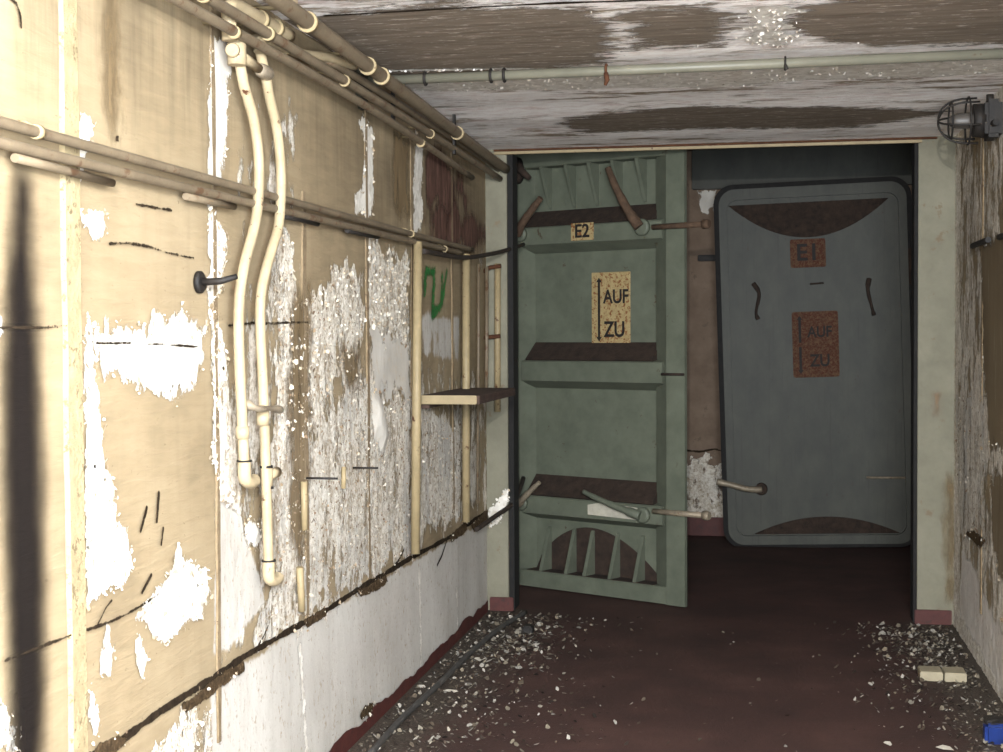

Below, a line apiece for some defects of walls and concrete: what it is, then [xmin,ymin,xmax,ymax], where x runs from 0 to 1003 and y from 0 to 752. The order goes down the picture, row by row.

peeling [207,36,232,178]
peeling [355,115,375,218]
peeling [412,129,424,239]
peeling [317,0,1003,92]
peeling [558,106,952,134]
peeling [81,205,236,611]
peeling [253,227,510,653]
peeling [955,232,1003,582]
peeling [135,542,214,683]
peeling [0,691,20,752]
peeling [88,624,130,752]
peeling [151,662,245,752]